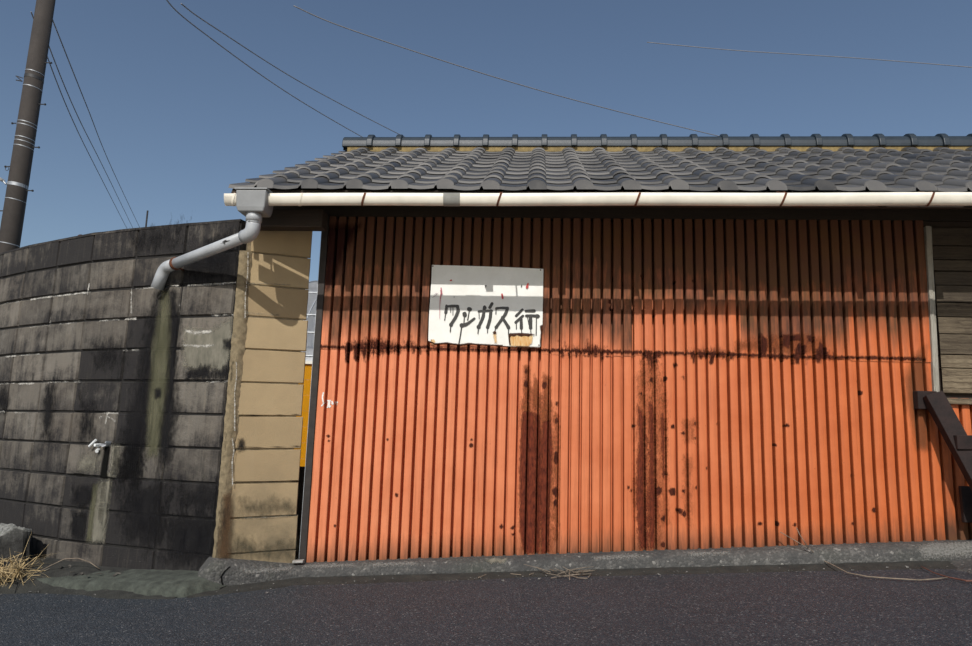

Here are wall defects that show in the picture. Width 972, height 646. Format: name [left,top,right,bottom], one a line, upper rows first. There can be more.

water stain [42,382,55,436]
water stain [71,235,239,568]
rust [321,334,926,554]